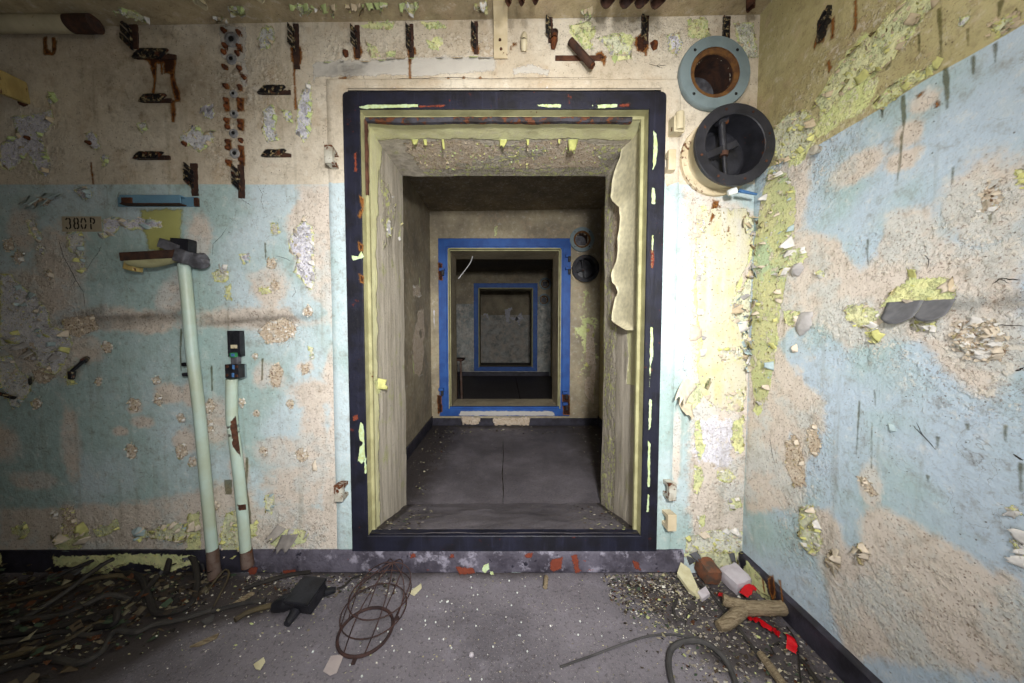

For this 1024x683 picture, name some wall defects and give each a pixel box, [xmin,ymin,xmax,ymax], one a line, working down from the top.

rust [146,60,181,122]
rust [219,26,249,131]
rust [290,46,302,110]
rust [634,34,649,56]
peeling [0,92,59,176]
rust [226,140,245,167]
peeling [270,215,316,290]
peeling [675,0,944,497]
peeling [843,267,1010,364]
peeling [47,505,202,575]
peeling [214,493,309,560]
peeling [797,504,871,578]